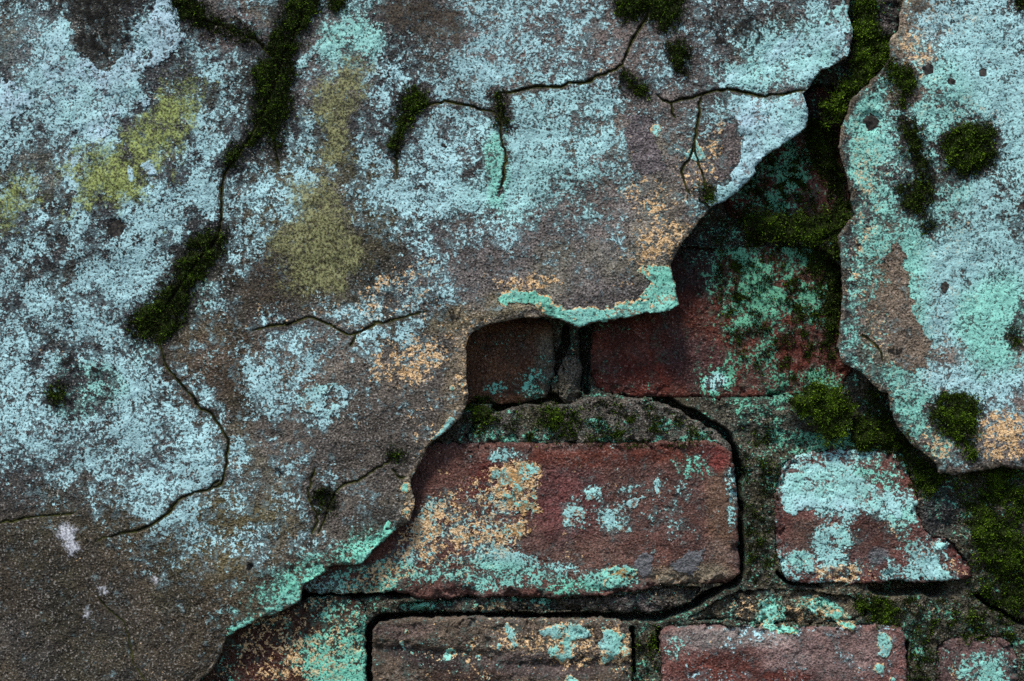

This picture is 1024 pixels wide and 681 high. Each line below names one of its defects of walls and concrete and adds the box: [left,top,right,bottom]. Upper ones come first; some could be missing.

damp [65,81,204,209]
damp [238,57,371,308]
crack [394,7,805,196]
spalling [711,122,745,182]
crack [95,2,306,542]
crack [252,310,429,347]
peeling [498,264,678,327]
spalling [870,242,932,374]
crack [0,511,77,524]
peeling [217,568,328,661]
peeling [538,621,630,681]
peeling [873,632,896,681]